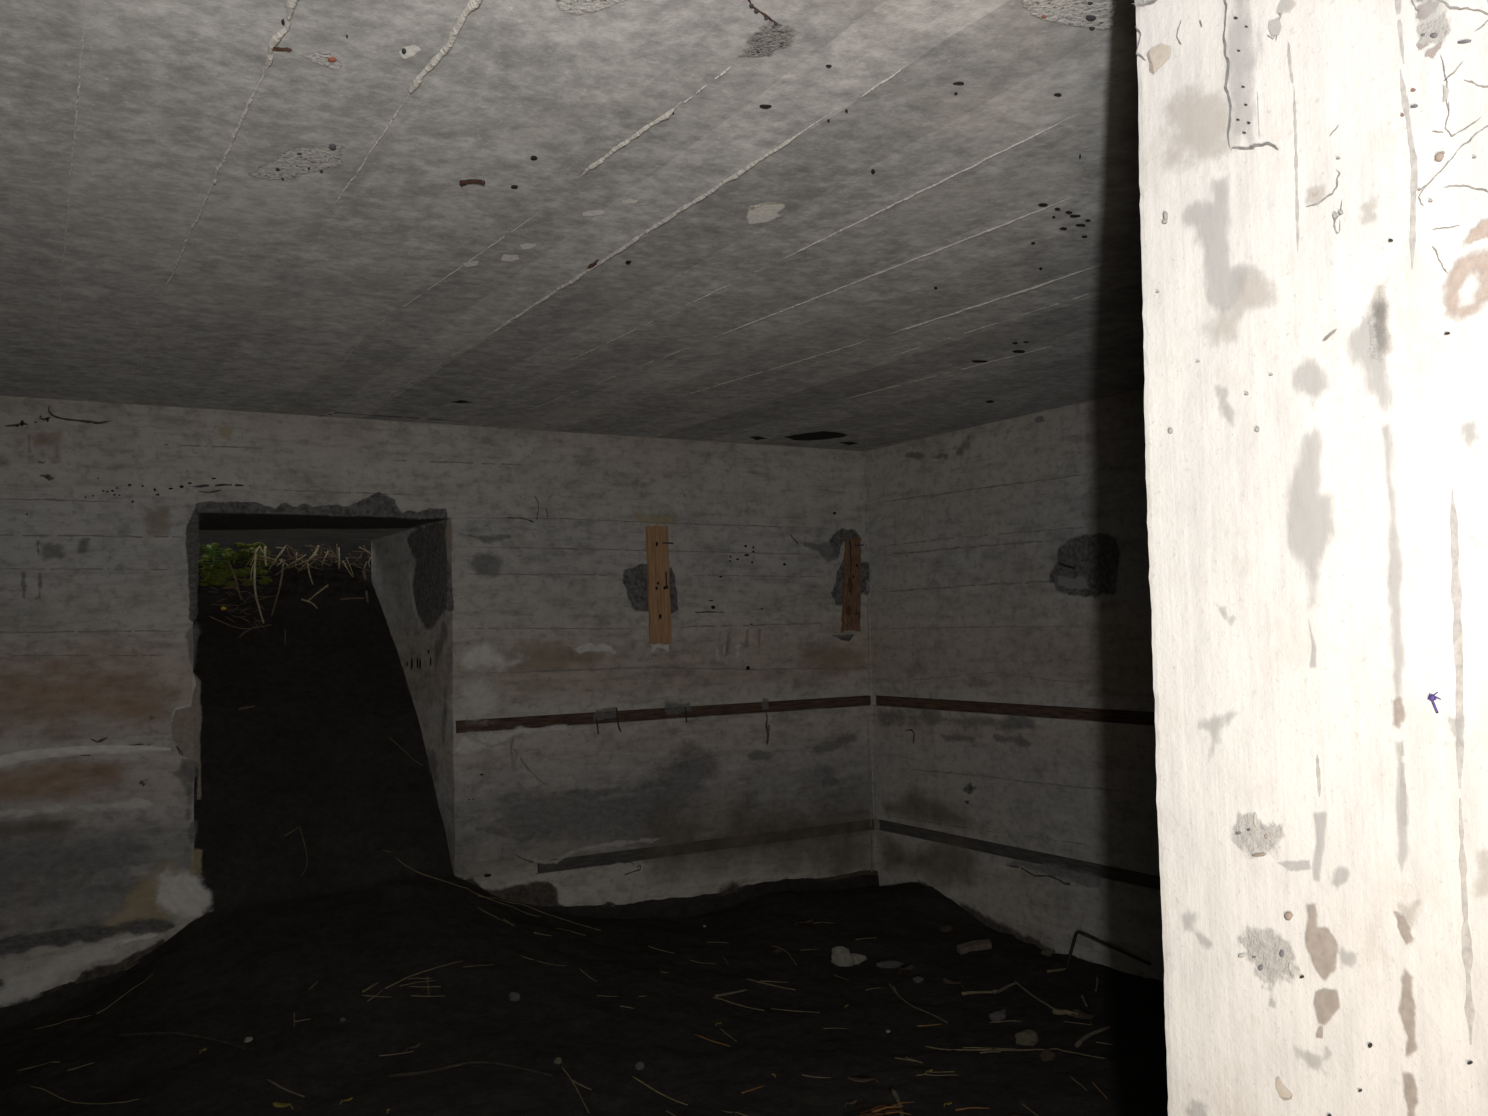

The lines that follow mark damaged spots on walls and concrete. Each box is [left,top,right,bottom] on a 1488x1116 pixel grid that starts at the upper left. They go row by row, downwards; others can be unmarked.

spalling [1022,0,1151,30]
crack [1132,0,1279,150]
crack [1411,0,1488,272]
corrosion [1447,220,1488,317]
water stain [0,798,153,819]
spalling [1234,813,1283,857]
spalling [1238,929,1304,983]